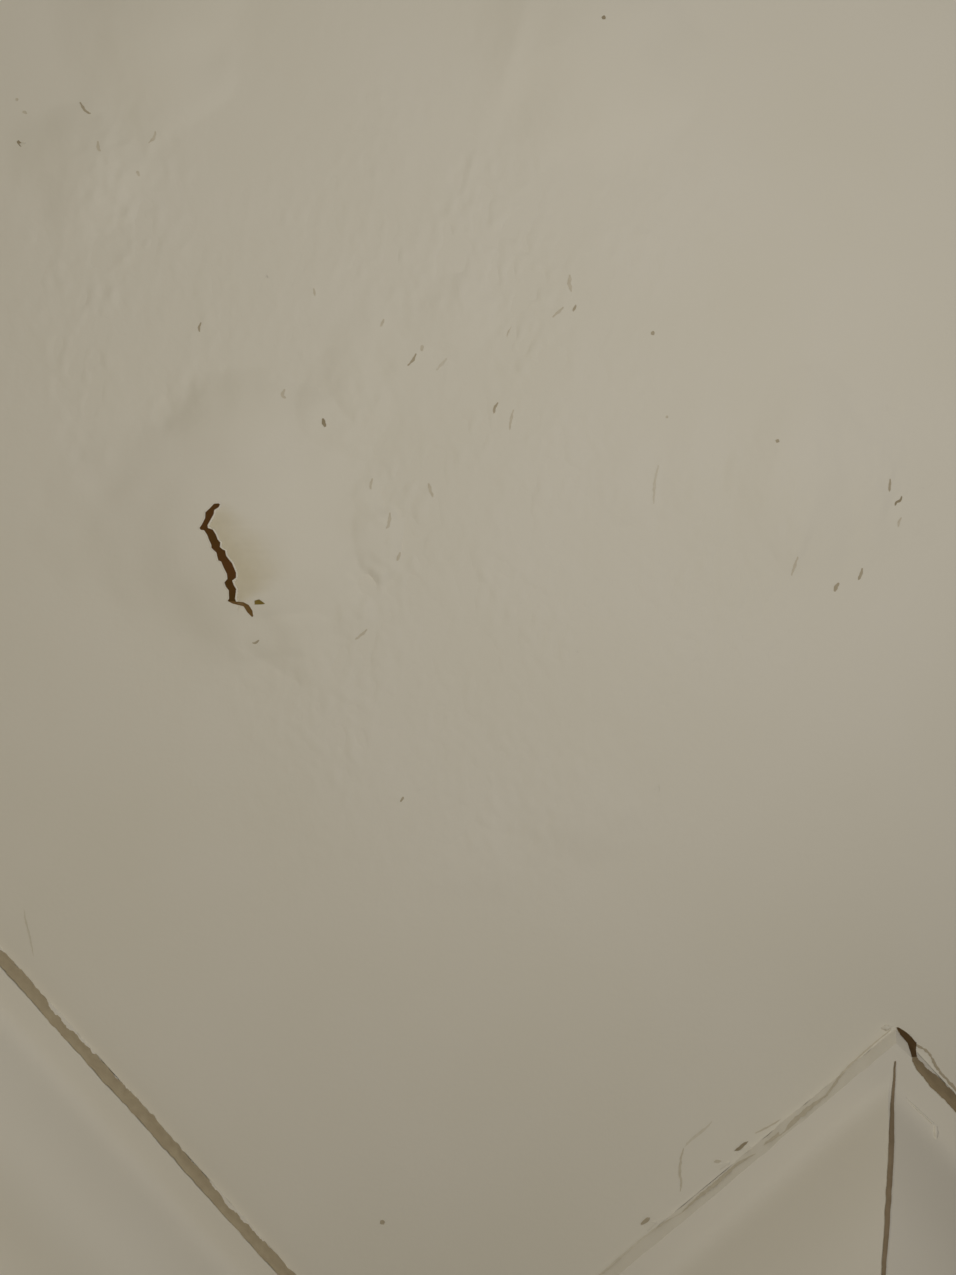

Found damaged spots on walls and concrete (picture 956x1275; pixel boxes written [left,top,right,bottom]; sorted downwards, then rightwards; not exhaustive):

crack [198,502,265,617]